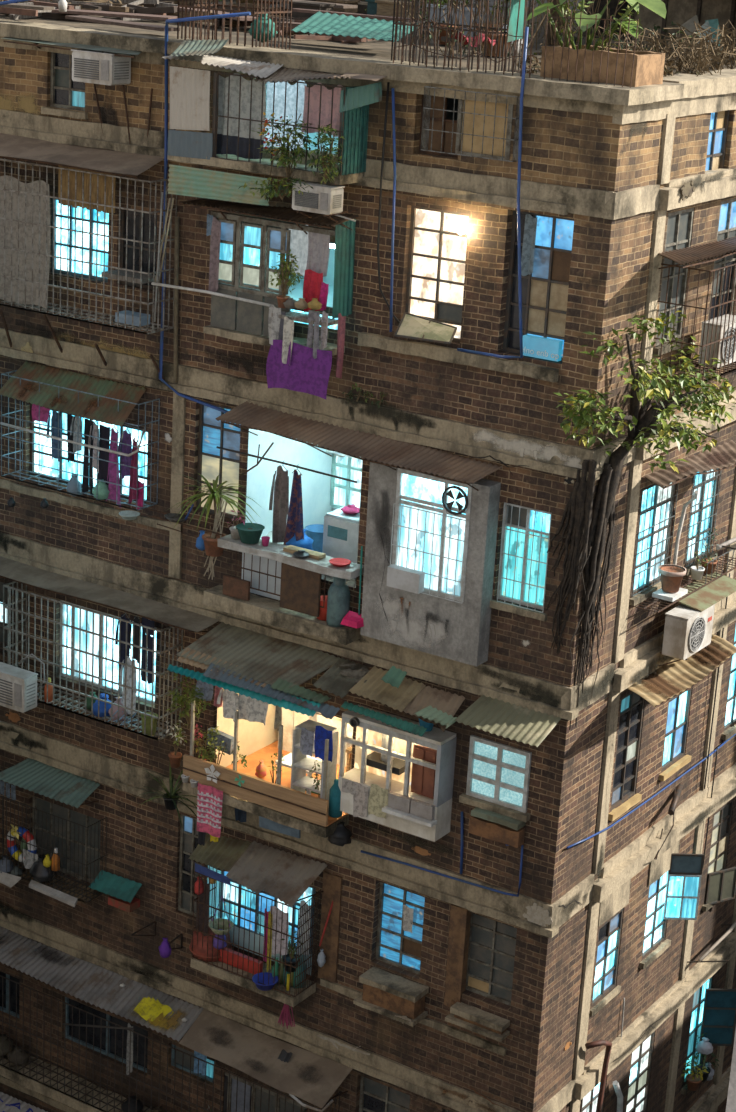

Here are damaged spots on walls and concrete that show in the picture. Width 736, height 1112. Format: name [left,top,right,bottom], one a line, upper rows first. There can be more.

water stain [376,492,390,552]
water stain [380,599,448,647]